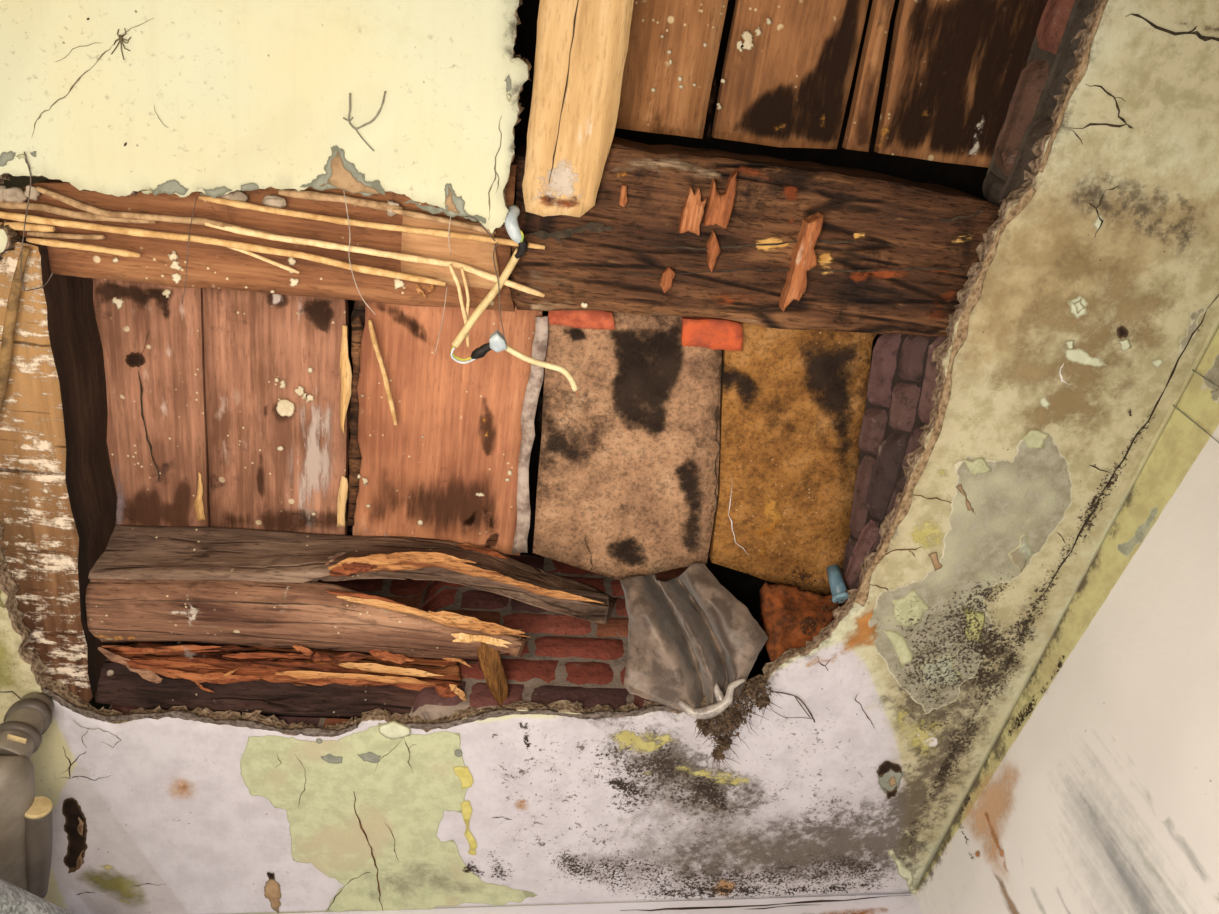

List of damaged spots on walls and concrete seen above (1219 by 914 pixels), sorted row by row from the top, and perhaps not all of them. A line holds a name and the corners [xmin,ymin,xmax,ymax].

peeling [300,145,385,196]
peeling [404,183,486,224]
water stain [736,0,860,143]
water stain [886,0,1048,157]
crack [1065,84,1133,144]
crack [1126,14,1219,41]
spalling [854,186,1073,714]
water stain [895,414,1156,859]
peeling [42,687,682,913]
crack [328,791,398,911]
water stain [493,719,896,899]
corrosion [959,776,1019,914]